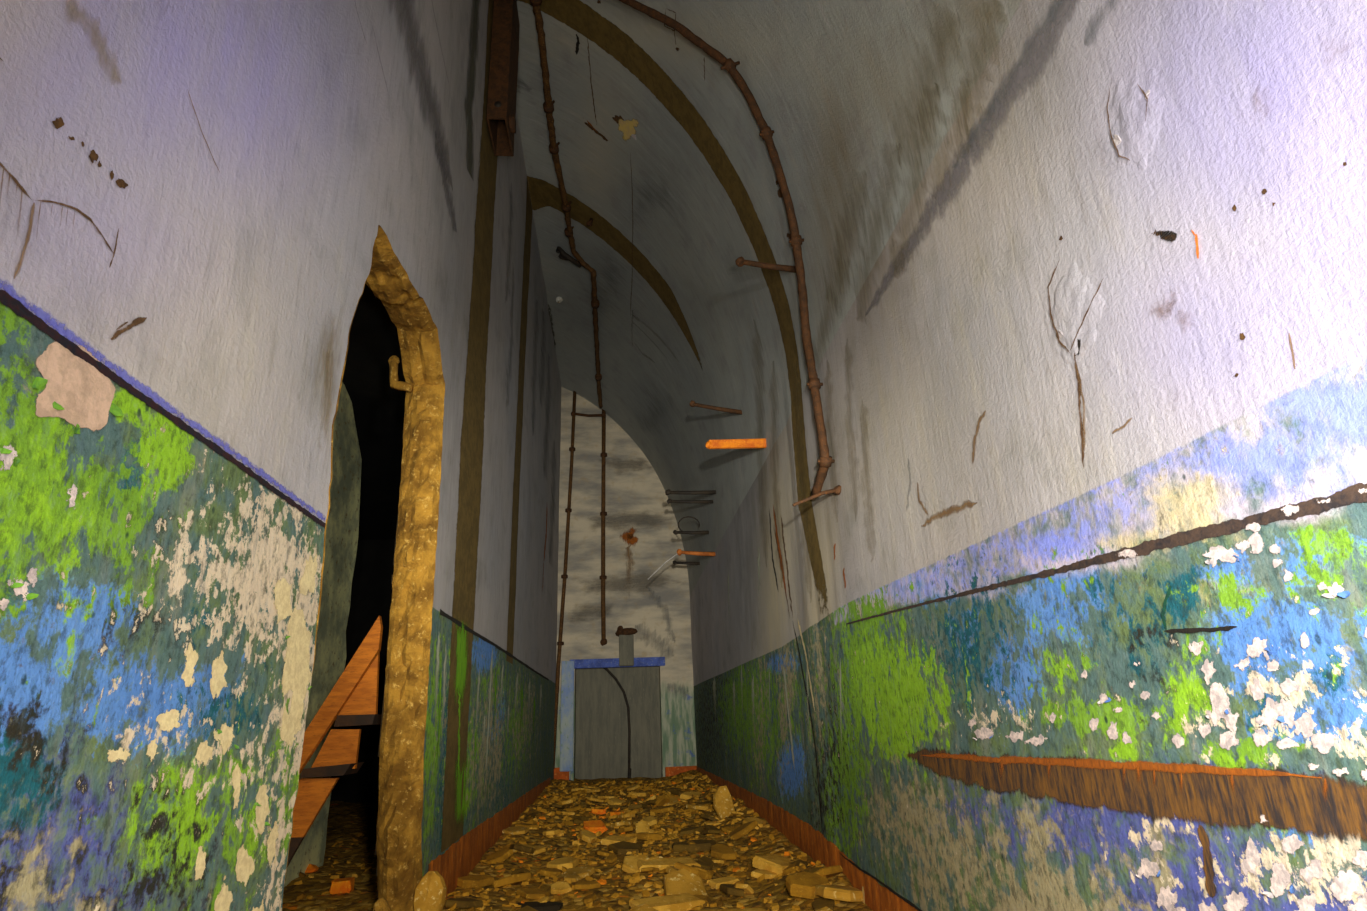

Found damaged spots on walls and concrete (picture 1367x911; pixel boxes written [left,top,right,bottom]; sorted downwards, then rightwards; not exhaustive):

crack [0,162,119,267]
peeling [32,342,123,434]
peeling [0,445,20,471]
peeling [66,483,78,510]
peeling [1281,504,1299,517]
peeling [0,567,39,611]
spalling [195,225,445,911]
peeling [1203,522,1294,582]
peeling [181,643,228,699]
peeling [1160,581,1367,781]
peeling [107,709,182,763]
peeling [1136,834,1367,911]